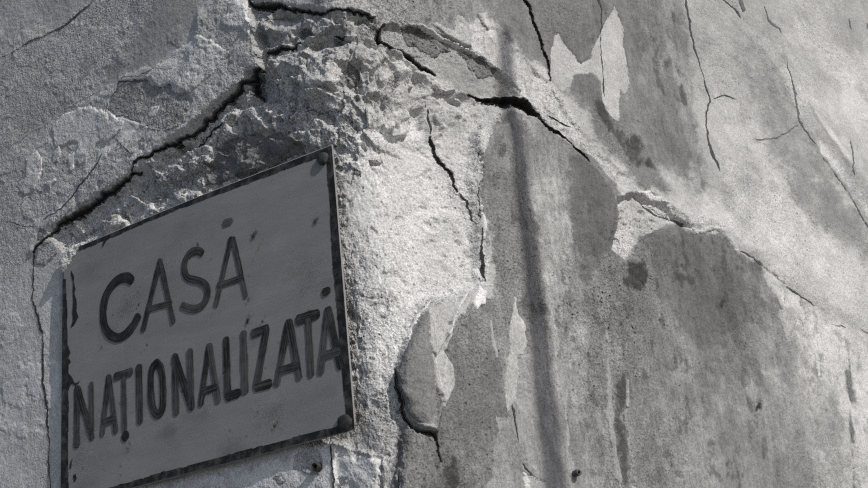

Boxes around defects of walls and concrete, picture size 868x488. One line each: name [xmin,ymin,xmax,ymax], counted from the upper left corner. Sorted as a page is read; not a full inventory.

peeling [52,35,229,172]
crack [249,0,436,76]
spalling [400,15,523,93]
crack [468,94,590,162]
peeling [550,6,630,121]
leakage [596,101,653,167]
crack [425,104,486,281]
crack [4,42,301,488]
leakage [624,263,648,289]
peeling [407,286,487,410]
leakage [616,373,629,482]
leakage [845,359,855,401]